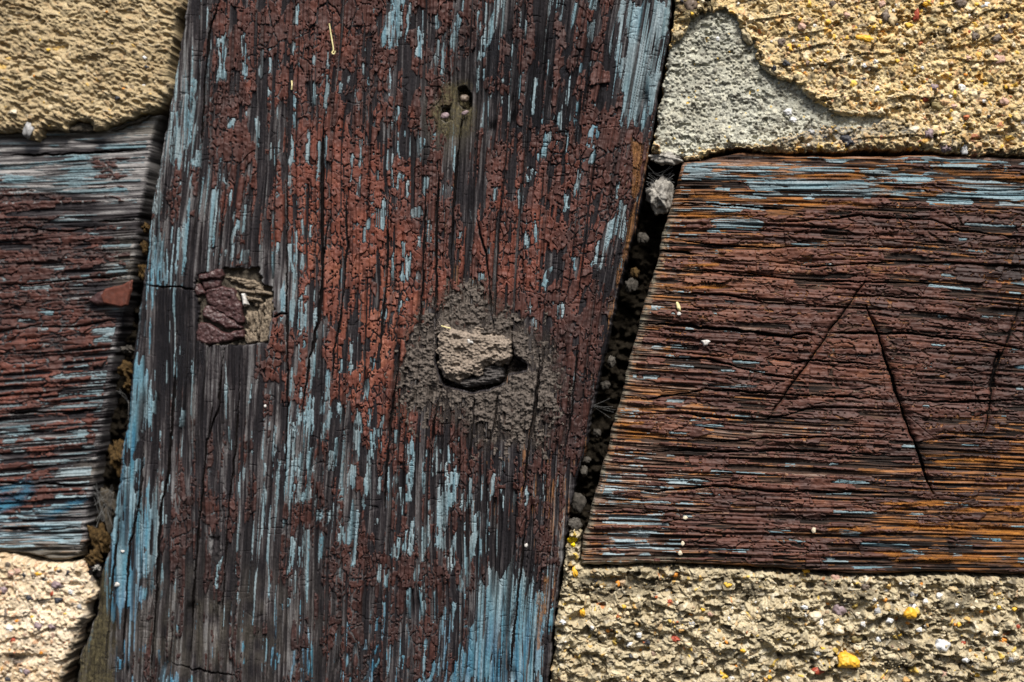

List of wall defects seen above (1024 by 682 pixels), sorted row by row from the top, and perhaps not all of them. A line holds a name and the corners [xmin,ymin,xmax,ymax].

spalling [69,115,152,133]
peeling [0,157,133,519]
peeling [131,0,886,682]
crack [605,323,1024,457]